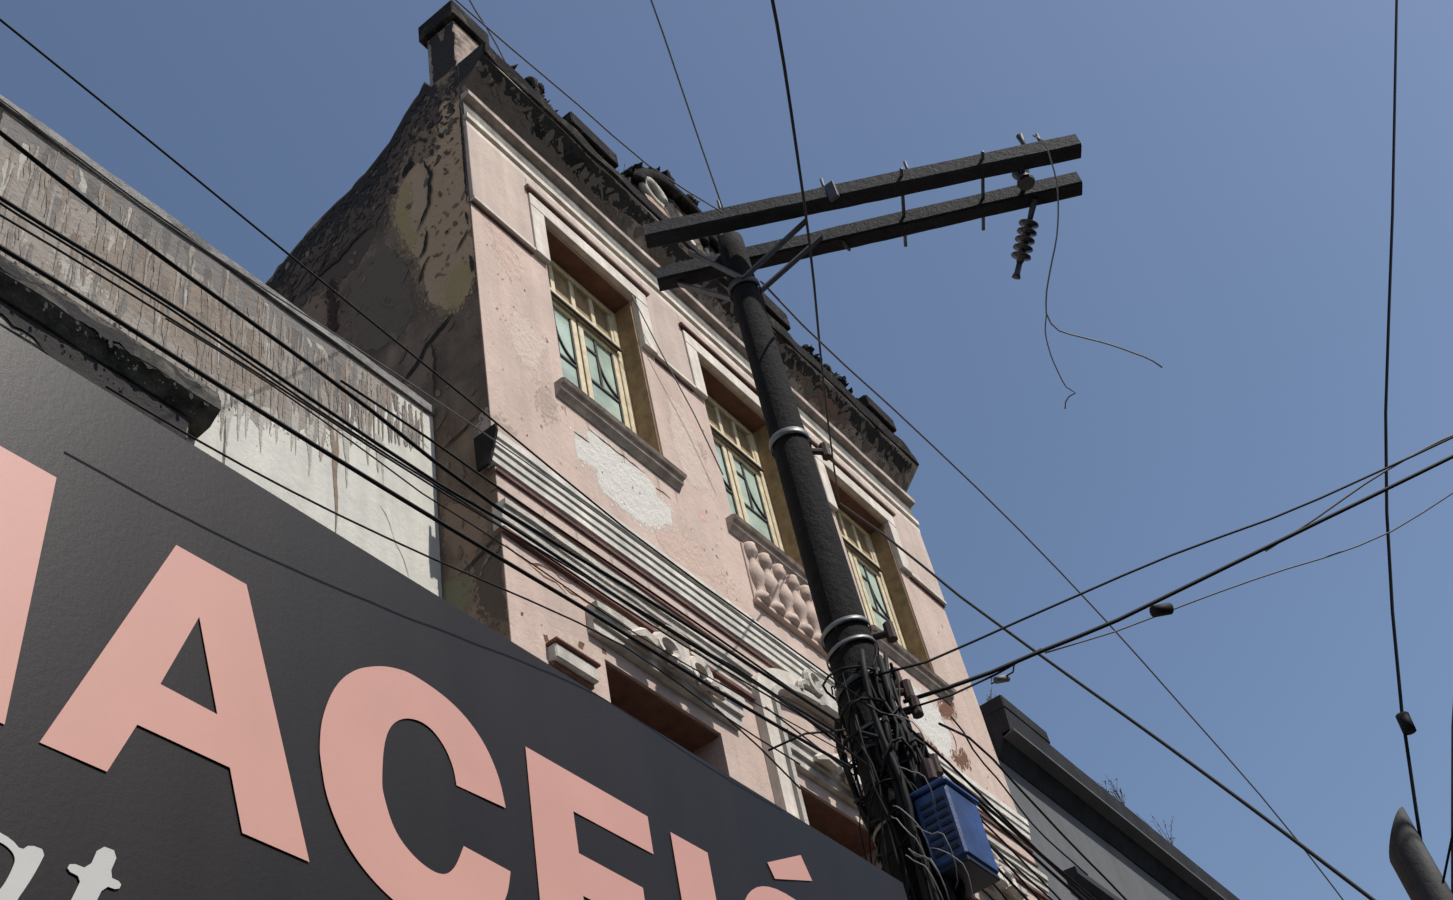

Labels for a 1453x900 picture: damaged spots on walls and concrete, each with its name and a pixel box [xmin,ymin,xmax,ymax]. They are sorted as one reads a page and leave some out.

leakage [0,22,694,486]
peeling [388,95,477,395]
crack [417,96,468,283]
leakage [693,279,744,343]
peeling [569,425,678,534]
leakage [773,332,912,490]